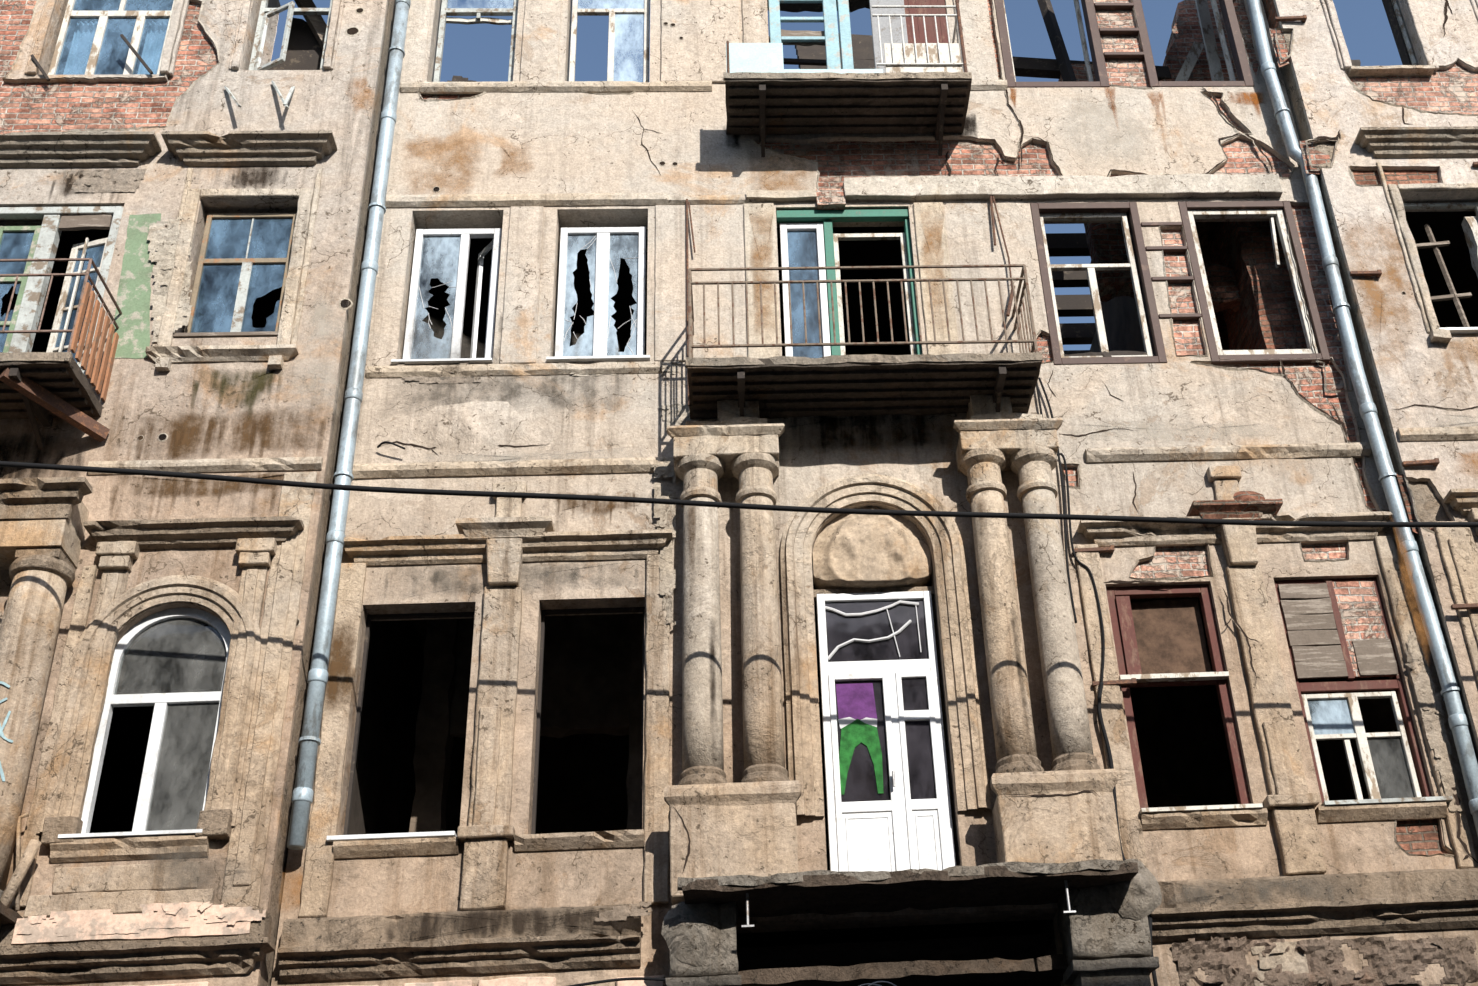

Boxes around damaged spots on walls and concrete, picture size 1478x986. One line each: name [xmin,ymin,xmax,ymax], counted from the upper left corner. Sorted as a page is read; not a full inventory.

crack [1442,0,1453,38]
flaking render [0,0,220,135]
flaking render [1344,58,1478,117]
crack [635,114,663,175]
flaking render [751,135,1064,189]
crack [980,90,1063,176]
flaking render [1108,91,1444,187]
flaking render [1158,201,1381,512]
leakage [168,371,304,458]
crack [1395,403,1478,411]
crack [381,441,439,456]
leakage [144,474,284,499]